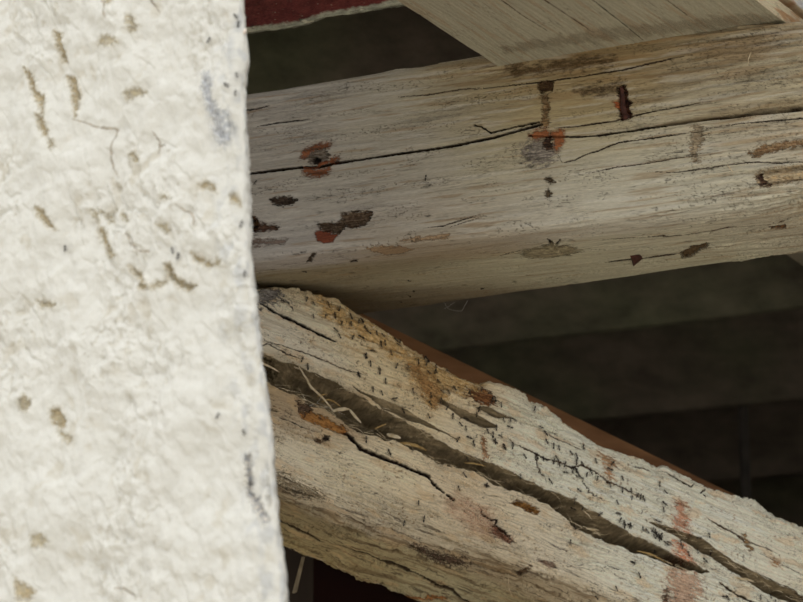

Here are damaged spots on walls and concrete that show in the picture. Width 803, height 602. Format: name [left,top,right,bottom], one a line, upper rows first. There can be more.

corrosion [300,142,340,179]
crack [246,103,803,175]
corrosion [529,128,566,151]
corrosion [315,231,338,244]
crack [260,299,336,342]
crack [262,342,803,602]